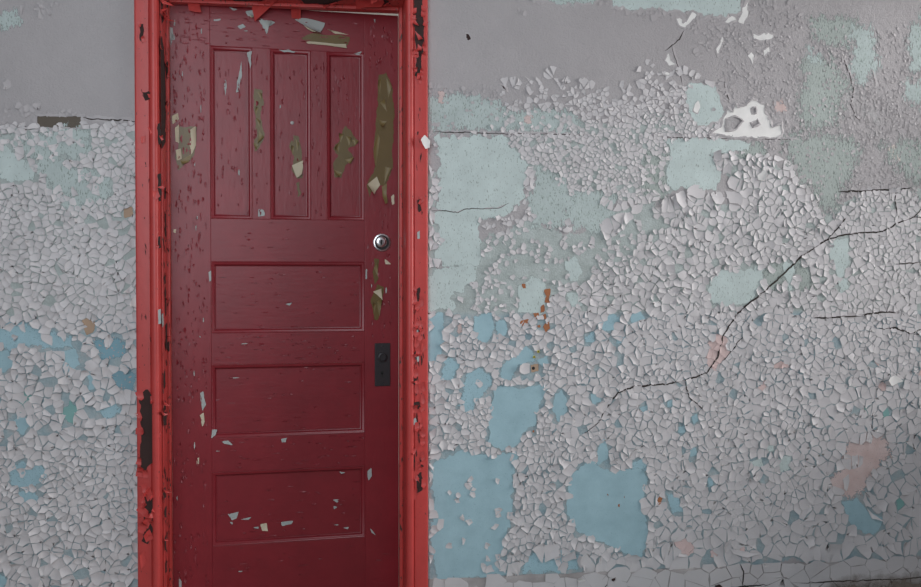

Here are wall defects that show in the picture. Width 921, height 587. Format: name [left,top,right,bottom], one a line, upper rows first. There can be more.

peeling [290,0,391,55]
peeling [148,0,197,170]
peeling [224,51,252,94]
peeling [289,135,303,197]
peeling [333,126,359,178]
peeling [367,73,395,205]
peeling [365,258,390,320]
crack [585,187,921,433]
peeling [200,391,232,445]
peeling [228,512,268,531]